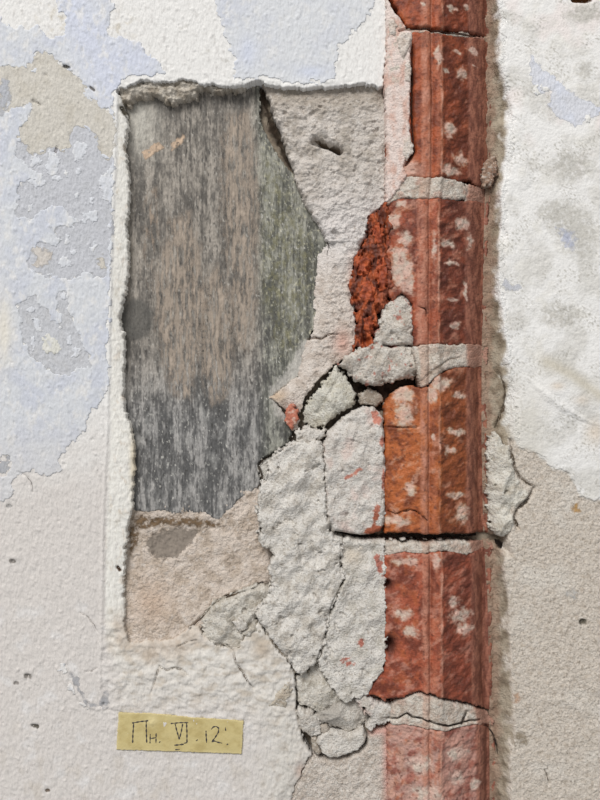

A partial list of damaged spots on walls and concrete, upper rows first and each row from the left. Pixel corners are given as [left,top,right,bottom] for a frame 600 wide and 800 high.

spalling [480,156,499,190]
peeling [0,0,416,710]
crack [493,368,506,425]
crack [257,446,286,489]
crack [338,509,476,539]
crack [390,712,498,754]